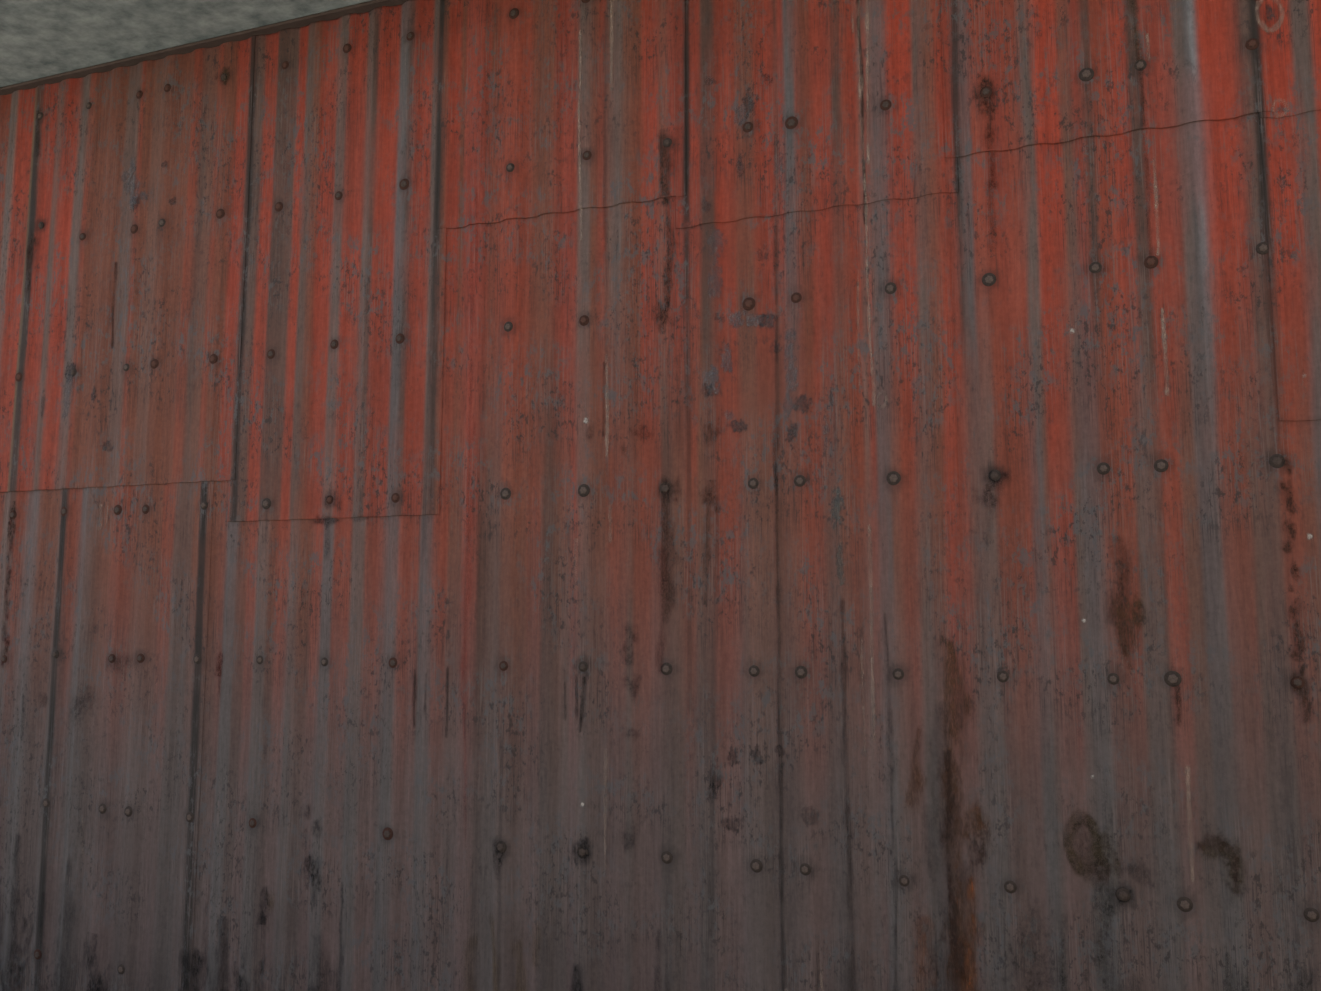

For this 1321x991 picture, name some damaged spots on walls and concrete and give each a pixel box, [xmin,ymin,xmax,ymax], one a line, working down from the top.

rust [942,641,986,991]